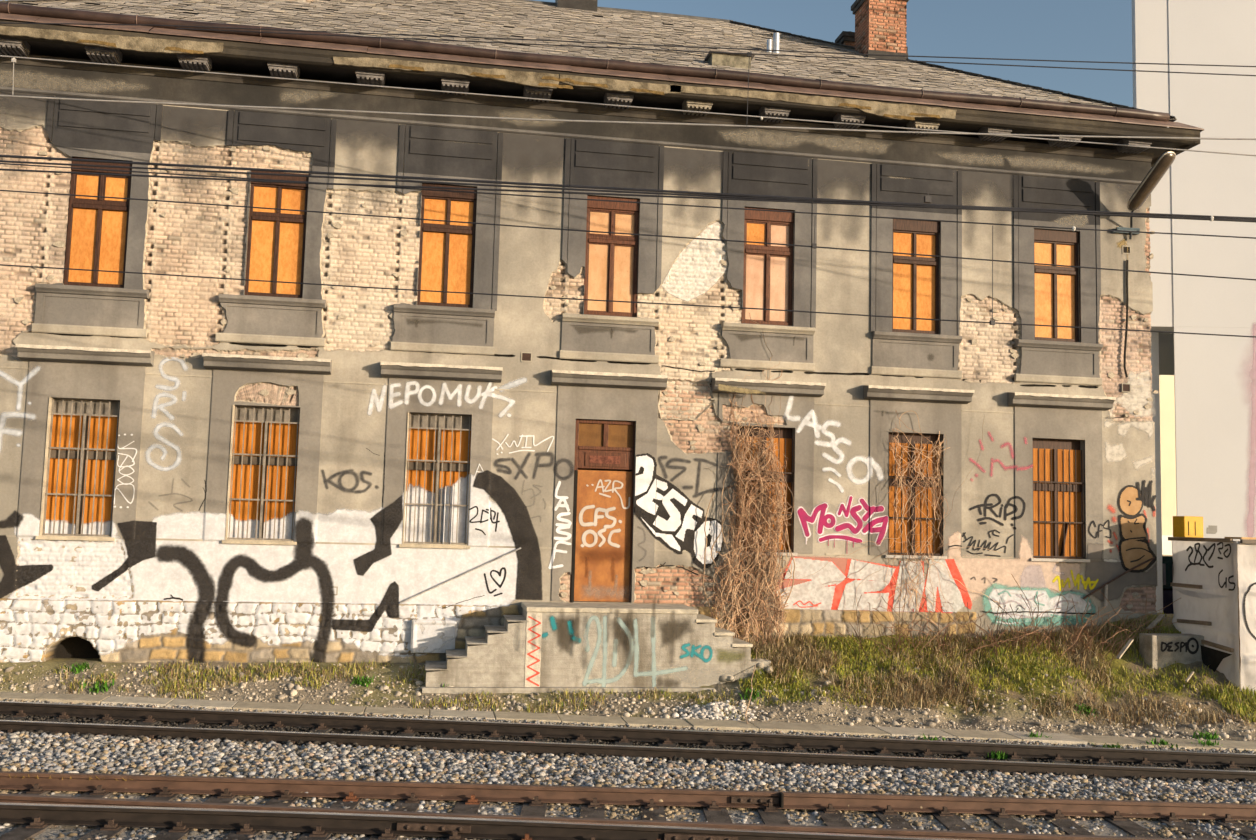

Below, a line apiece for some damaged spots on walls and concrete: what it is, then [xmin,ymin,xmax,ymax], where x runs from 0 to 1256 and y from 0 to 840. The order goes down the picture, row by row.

flaking render [0,124,72,360]
flaking render [143,140,422,360]
flaking render [542,258,584,323]
flaking render [637,219,787,455]
flaking render [957,293,1021,384]
flaking render [1098,294,1158,423]
flaking render [634,563,719,607]